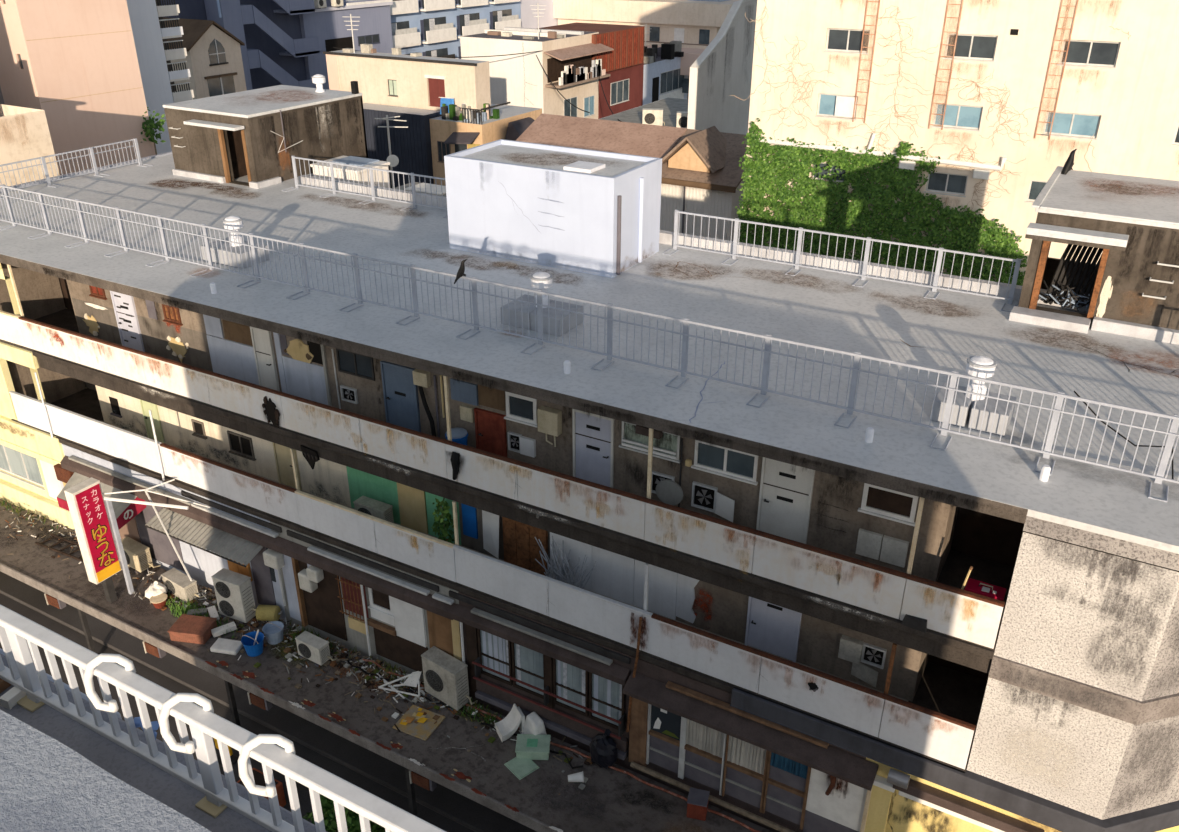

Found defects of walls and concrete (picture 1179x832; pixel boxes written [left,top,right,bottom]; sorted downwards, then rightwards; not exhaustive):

corrosion [502,517,548,576]
corrosion [631,613,647,647]
water stain [1050,541,1165,673]
water stain [894,804,949,832]